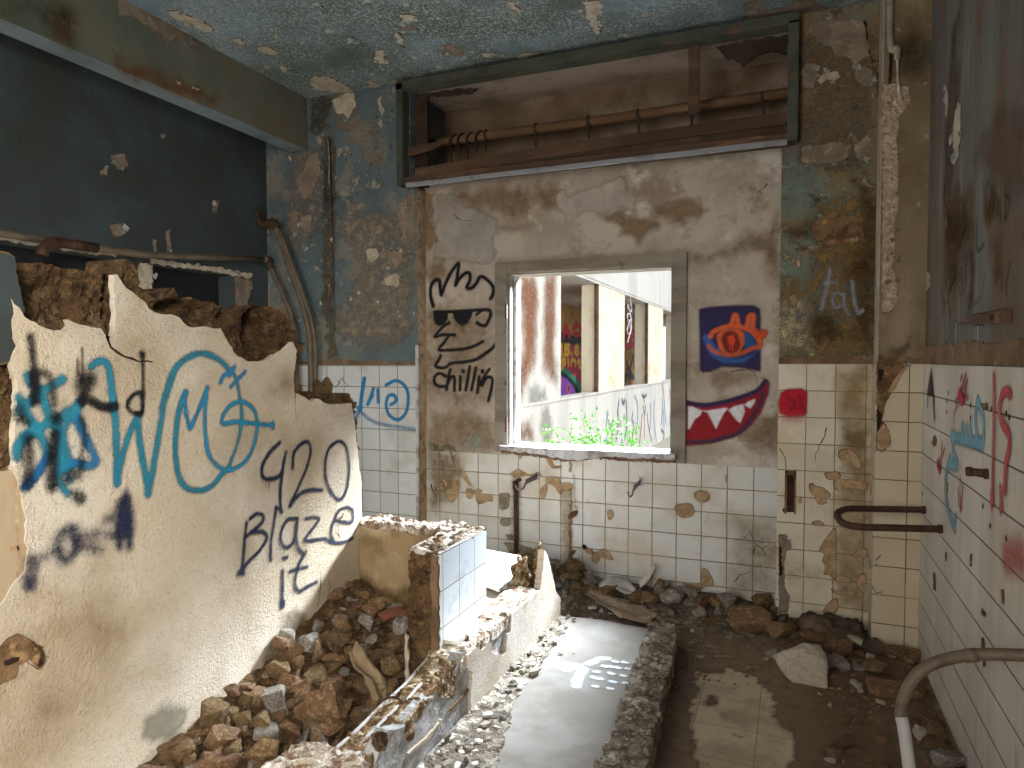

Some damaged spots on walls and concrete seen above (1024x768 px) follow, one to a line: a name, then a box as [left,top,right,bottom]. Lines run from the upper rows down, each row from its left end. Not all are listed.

peeling [742,0,910,166]
peeling [286,75,366,359]
water stain [461,189,557,215]
water stain [606,201,703,241]
peeling [137,229,254,306]
crack [105,336,153,363]
peeling [775,176,912,453]
spalling [441,467,534,557]
spalling [511,455,573,499]
spalling [674,490,710,518]
spalling [778,534,791,613]
spalling [812,520,868,613]